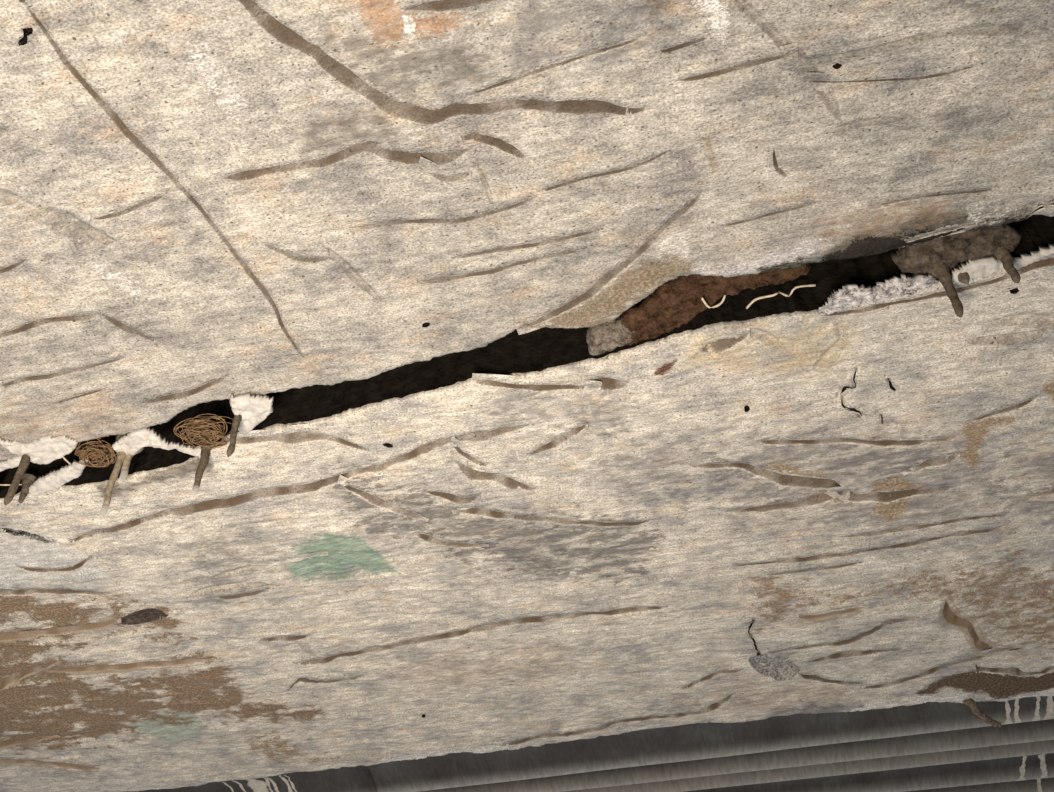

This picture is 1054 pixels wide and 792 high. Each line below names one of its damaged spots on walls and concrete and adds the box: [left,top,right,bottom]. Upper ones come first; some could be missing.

water stain [951,244,1054,284]
water stain [822,272,938,315]
crack [840,369,885,425]
crack [888,380,897,392]
crack [0,526,54,546]
crack [747,621,759,652]